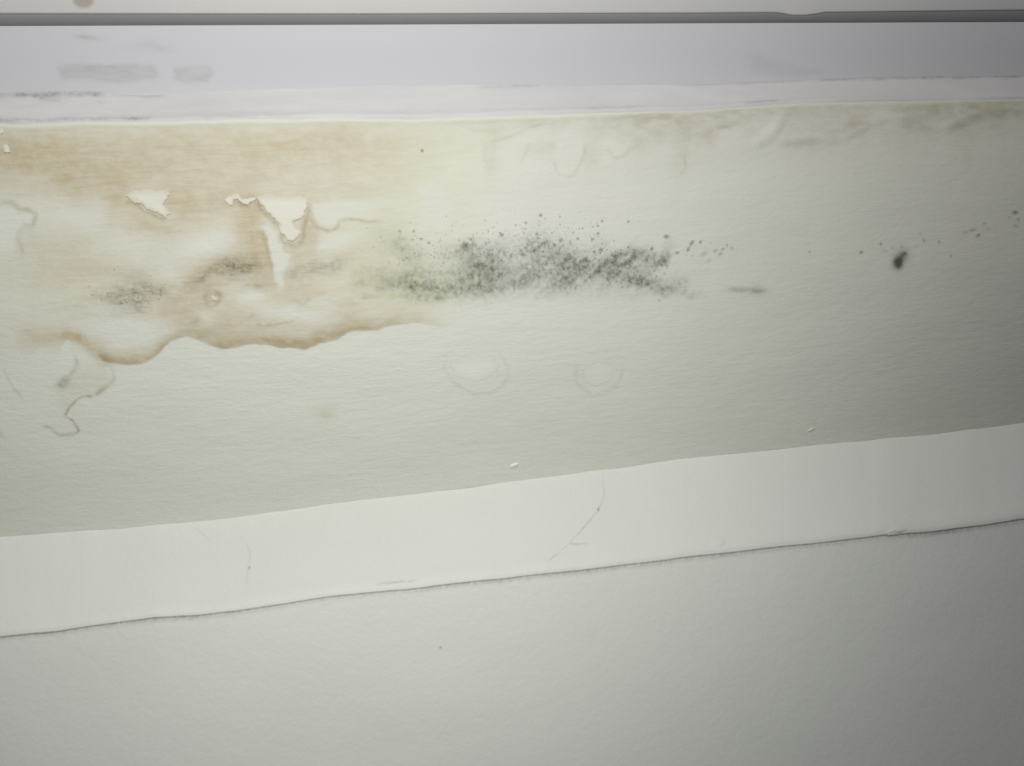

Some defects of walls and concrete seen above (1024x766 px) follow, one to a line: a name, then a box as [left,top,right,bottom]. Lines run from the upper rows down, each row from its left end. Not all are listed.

peeling [125,189,171,218]
peeling [224,193,307,241]